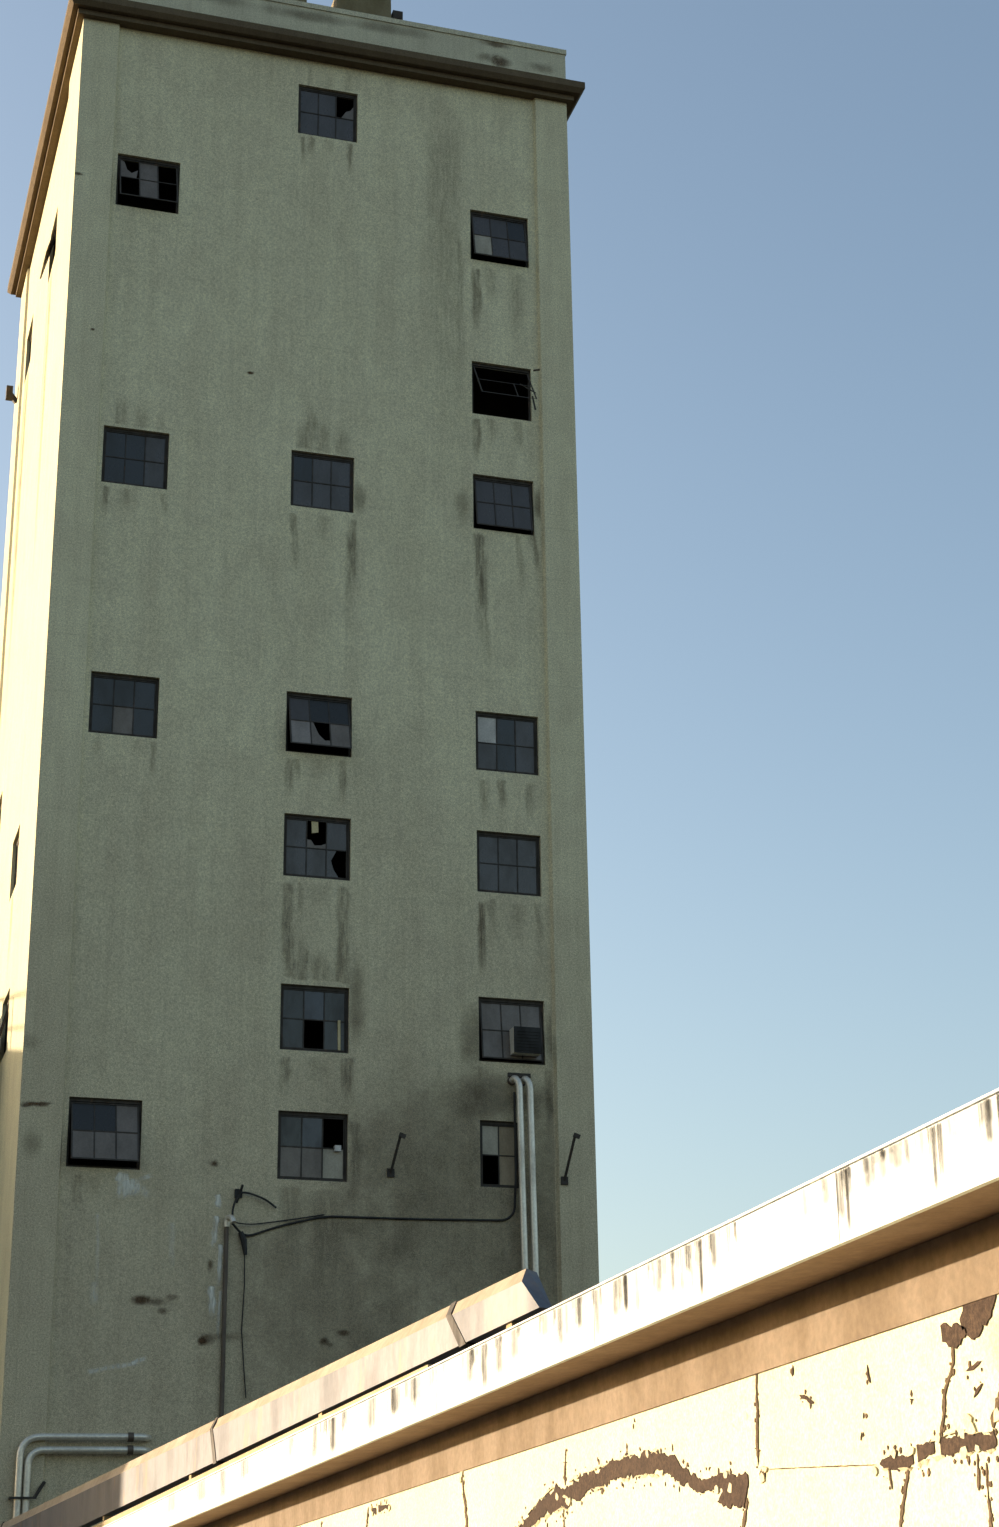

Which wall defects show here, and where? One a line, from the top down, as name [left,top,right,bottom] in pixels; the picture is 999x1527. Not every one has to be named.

water stain [929,1125,941,1185]
water stain [836,1169,849,1223]
water stain [657,1233,714,1290]
crack [940,1347,955,1434]
crack [459,1471,468,1527]
crack [561,1448,569,1527]
crack [740,1374,910,1527]
crack [973,1363,999,1527]